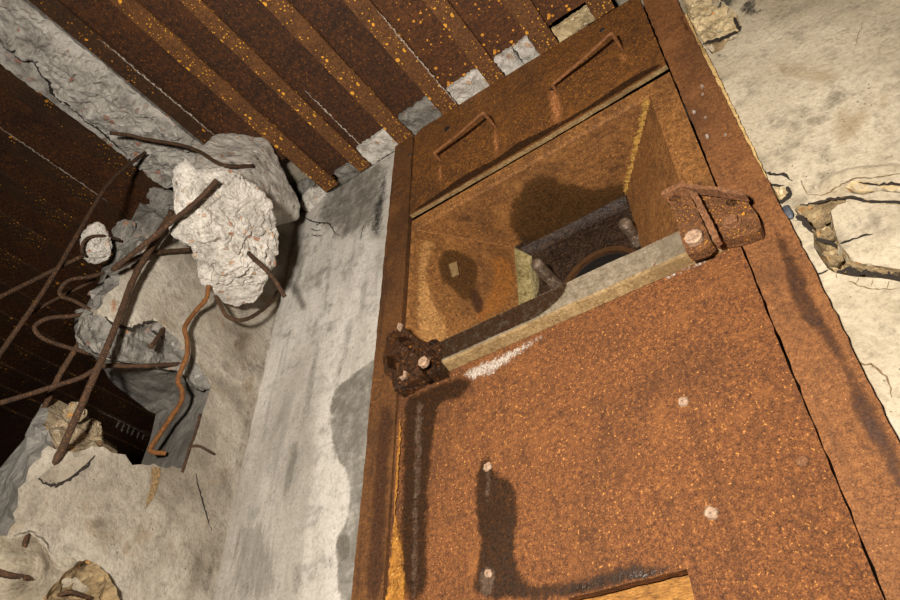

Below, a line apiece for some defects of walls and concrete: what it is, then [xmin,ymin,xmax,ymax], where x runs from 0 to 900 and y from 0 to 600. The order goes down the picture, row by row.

rust [549,91,561,122]
leakage [510,176,625,247]
crack [764,171,900,196]
crack [840,233,873,244]
rust [417,241,448,342]
leakage [432,251,566,359]
crack [817,269,897,290]
spalling [76,315,213,391]
peeling [145,467,161,508]
rust [385,419,406,600]
leakage [401,344,532,600]
leakage [474,461,662,599]